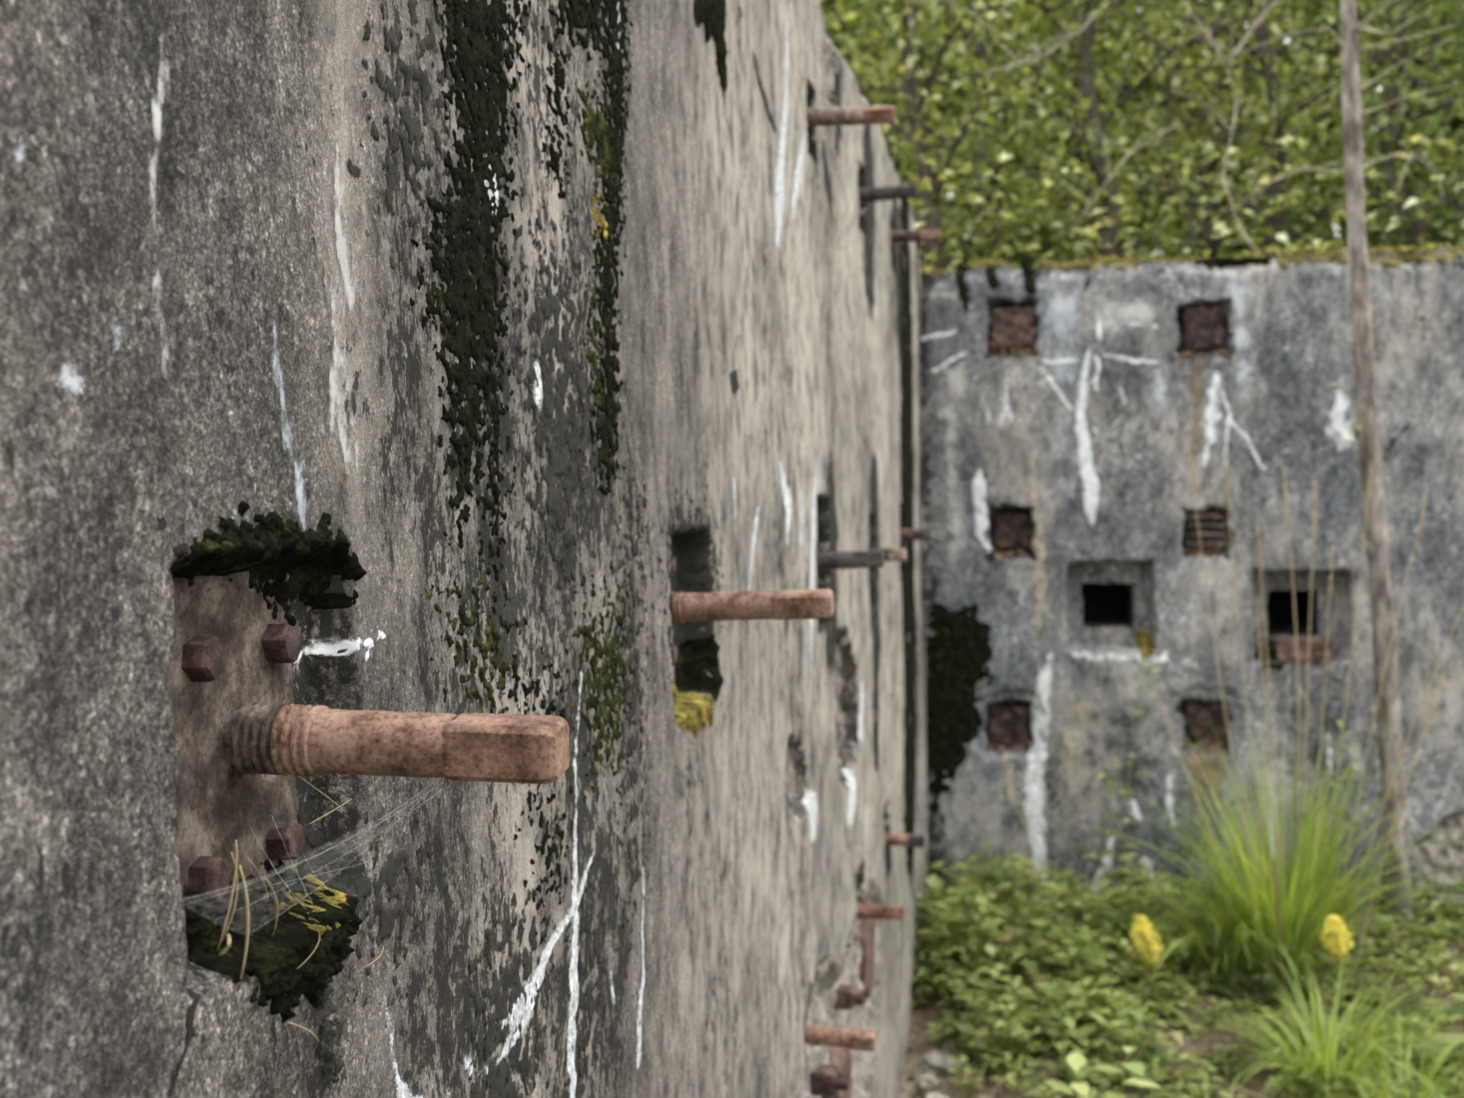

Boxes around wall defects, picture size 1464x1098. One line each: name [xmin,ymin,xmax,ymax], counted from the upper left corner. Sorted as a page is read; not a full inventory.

leakage [1147,365,1169,417]
leakage [1225,281,1258,391]
leakage [1027,273,1160,631]
spalling [1411,811,1464,904]
spalling [803,876,884,1098]